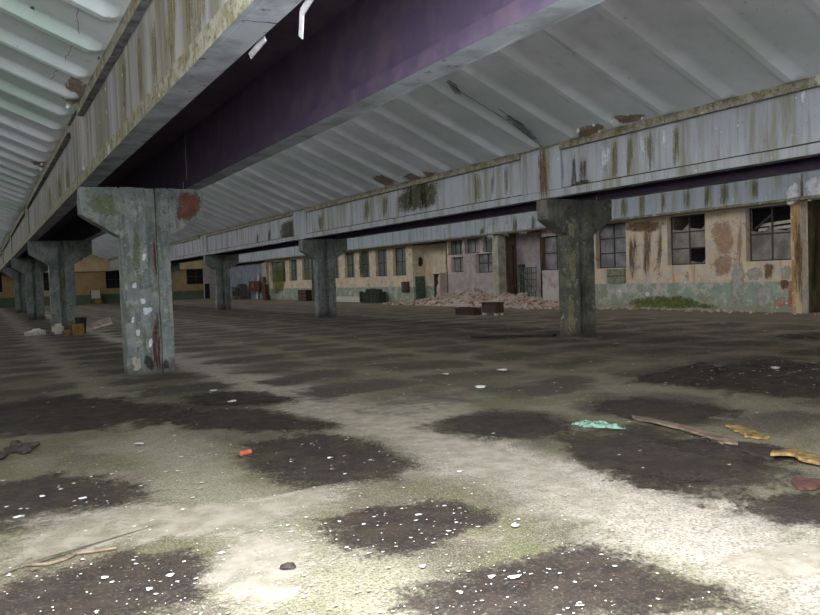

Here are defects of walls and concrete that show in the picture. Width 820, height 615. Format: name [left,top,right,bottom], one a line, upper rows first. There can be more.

leakage [166,0,176,61]
leakage [185,0,205,34]
spalling [62,76,87,109]
spalling [573,114,645,137]
rust [538,149,547,197]
leakage [602,144,617,176]
leakage [627,132,653,176]
leakage [662,126,679,159]
peeling [785,174,820,204]
rust [177,192,201,221]
leakage [622,195,664,277]